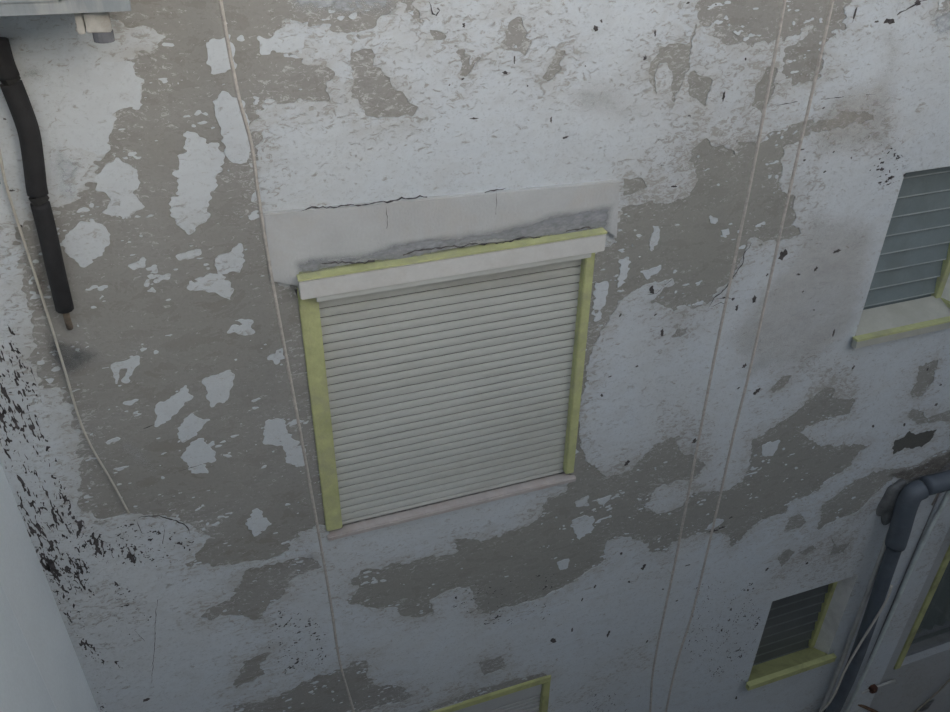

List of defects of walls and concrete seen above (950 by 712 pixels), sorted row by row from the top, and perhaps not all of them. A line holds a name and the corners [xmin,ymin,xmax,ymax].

peeling [500,13,532,74]
peeling [643,0,857,113]
peeling [870,144,906,185]
crack [303,195,427,229]
crack [319,258,375,266]
crack [403,236,540,256]
peeling [581,107,874,395]
peeling [0,0,481,712]
peeling [910,360,942,397]
peeling [892,403,950,454]
peeling [347,387,867,625]
peeling [817,450,950,530]